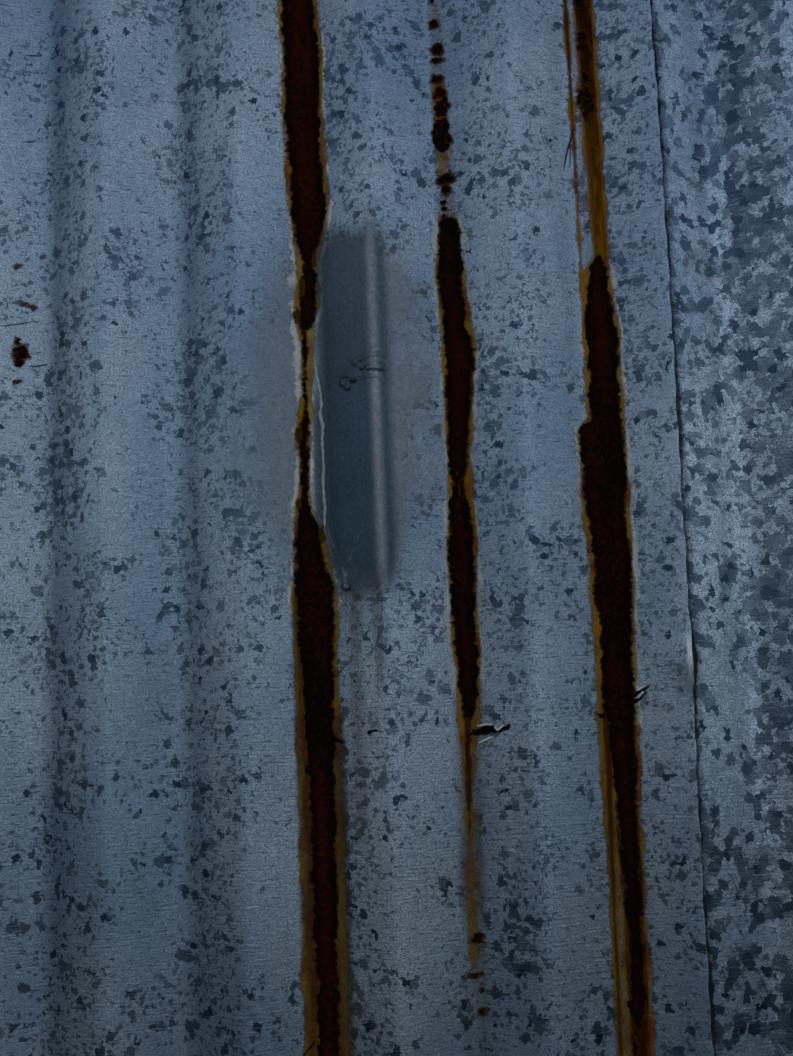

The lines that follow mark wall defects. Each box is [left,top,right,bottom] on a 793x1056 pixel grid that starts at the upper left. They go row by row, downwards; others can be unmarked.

corrosion [11,336,31,384]
corrosion [276,0,353,1056]
corrosion [429,42,485,993]
corrosion [562,0,656,1056]